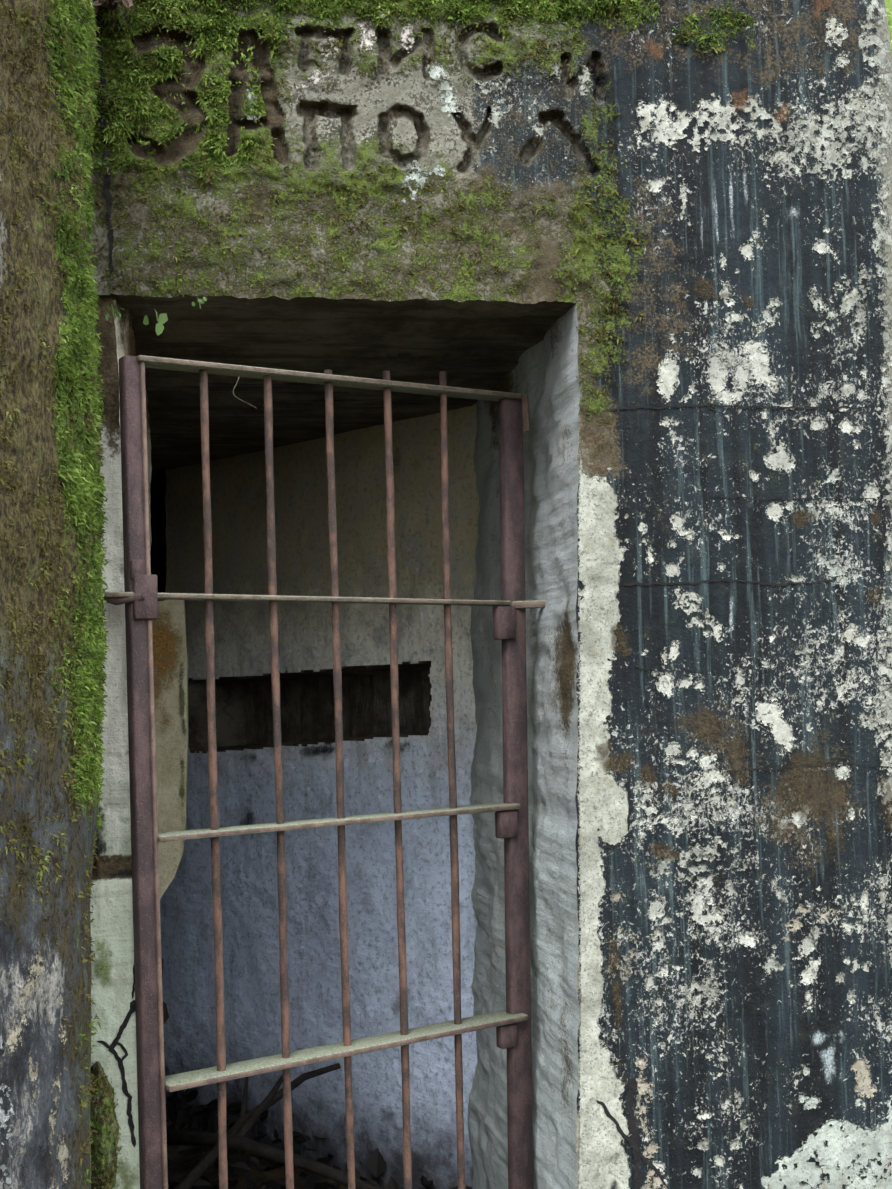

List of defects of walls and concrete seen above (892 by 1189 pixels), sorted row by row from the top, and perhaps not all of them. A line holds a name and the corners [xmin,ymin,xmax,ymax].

peeling [578,65,593,98]
peeling [634,0,892,836]
water stain [597,741,677,796]
flaking render [577,451,760,1189]
crack [97,966,136,1147]
peeling [739,856,892,1012]
peeling [761,1058,892,1189]
peeling [835,957,885,1033]